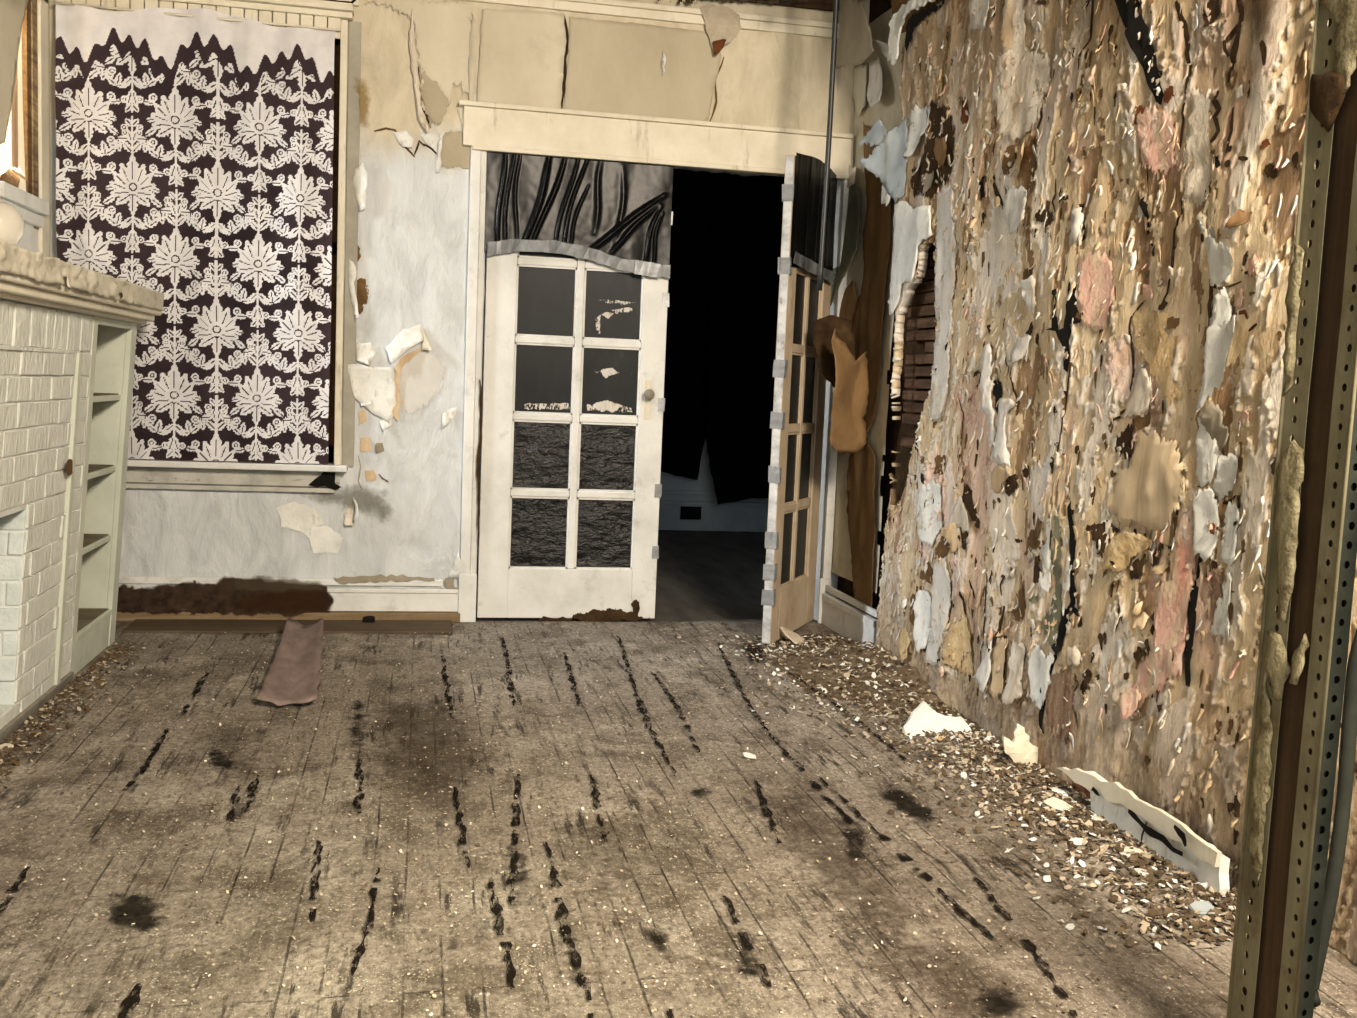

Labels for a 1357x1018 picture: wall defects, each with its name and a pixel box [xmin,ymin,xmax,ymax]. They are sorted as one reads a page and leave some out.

peeling [0,0,28,144]
crack [561,15,569,109]
peeling [365,0,819,133]
crack [709,57,724,122]
peeling [1274,105,1306,169]
spalling [348,246,369,321]
peeling [813,0,1283,749]
peeling [309,323,445,526]
damp [117,576,334,617]
peeling [538,600,649,622]
spalling [1044,787,1072,813]
peeling [1165,669,1250,845]